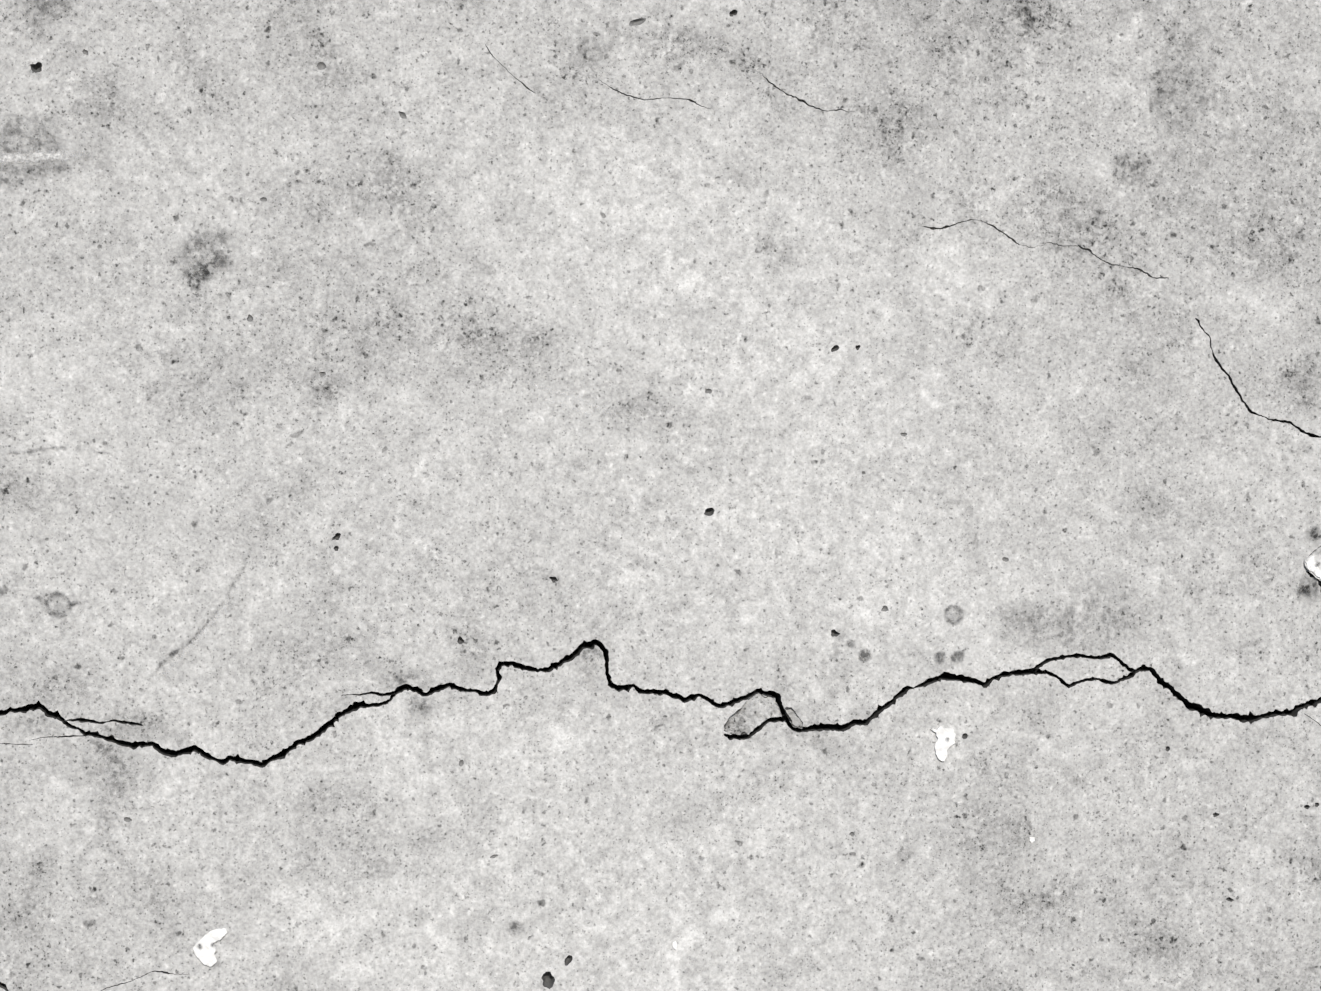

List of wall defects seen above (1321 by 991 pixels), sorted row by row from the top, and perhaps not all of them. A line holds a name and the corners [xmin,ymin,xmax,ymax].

crack [1195,318,1321,438]
peeling [1304,546,1321,592]
crack [0,639,1321,768]
peeling [193,928,227,967]
crack [101,971,189,991]